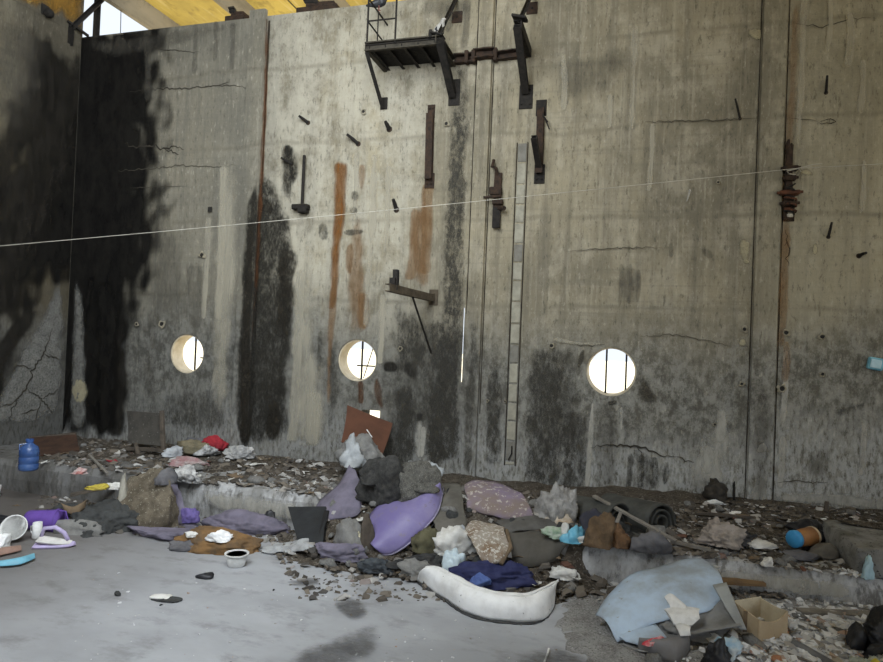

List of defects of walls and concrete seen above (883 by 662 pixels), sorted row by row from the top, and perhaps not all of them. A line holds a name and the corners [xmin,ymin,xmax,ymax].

crack [645,116,752,124]
damp [0,38,79,398]
damp [201,145,336,446]
rust [330,163,367,311]
rust [407,188,432,282]
damp [389,91,477,468]
crack [567,245,660,253]
crack [3,332,60,422]
damp [62,353,76,431]
damp [108,323,127,435]
damp [528,339,598,487]
crack [594,444,694,463]